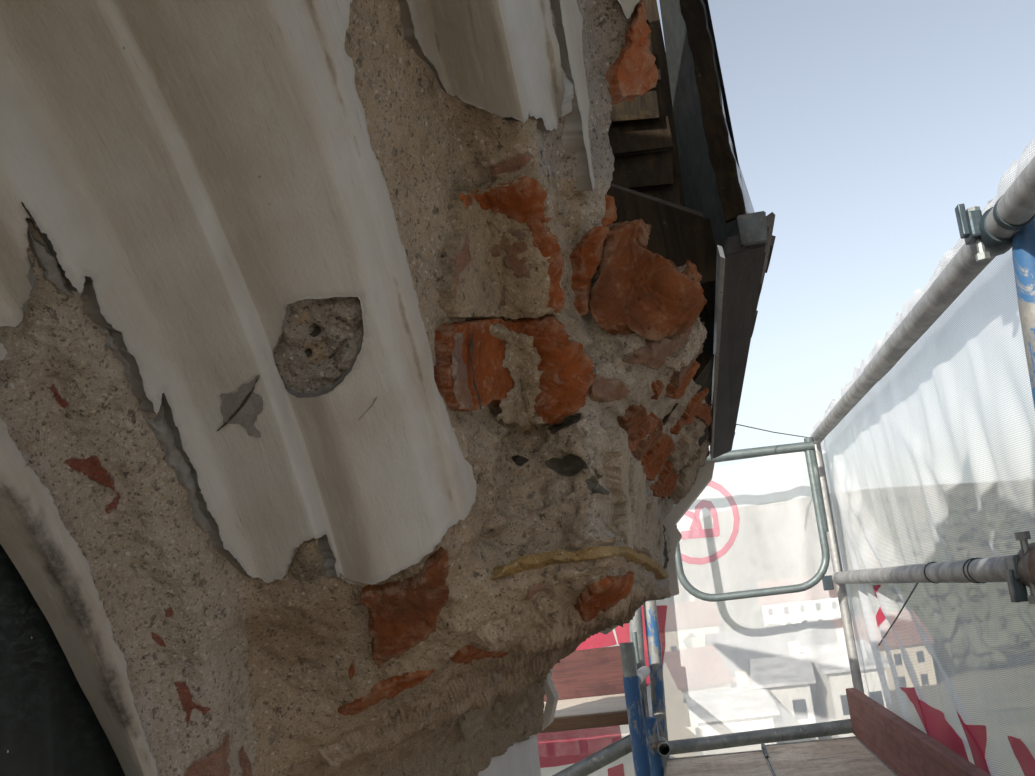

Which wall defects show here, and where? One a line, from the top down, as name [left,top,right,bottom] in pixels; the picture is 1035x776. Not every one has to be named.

spalling [0,0,713,776]